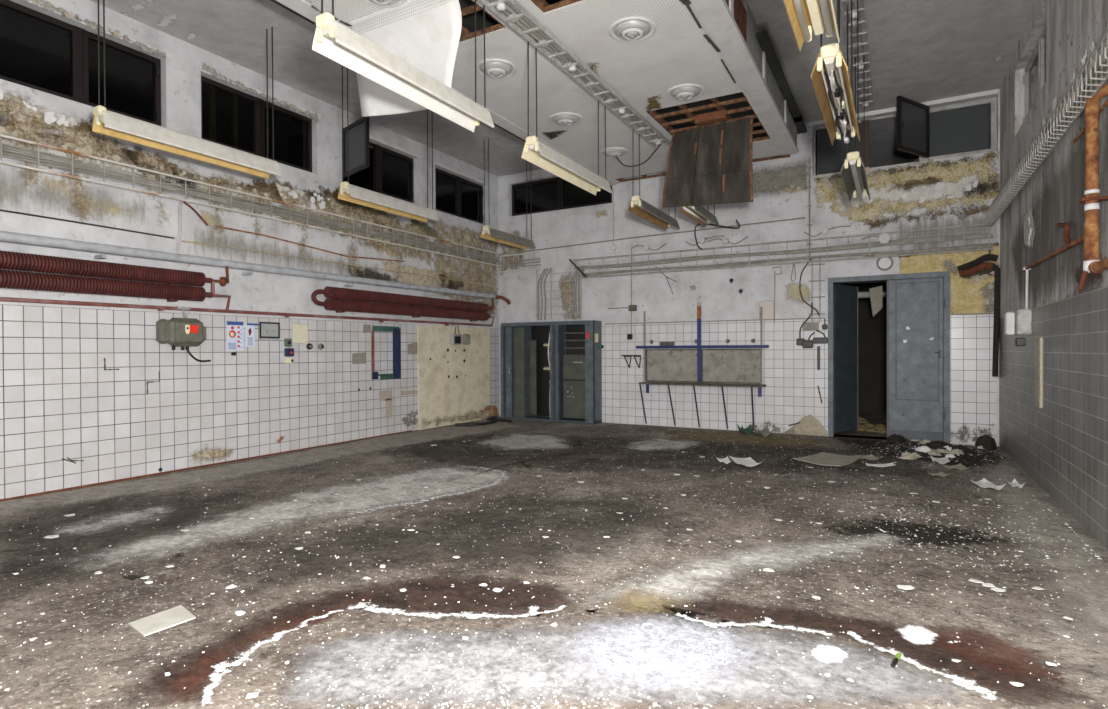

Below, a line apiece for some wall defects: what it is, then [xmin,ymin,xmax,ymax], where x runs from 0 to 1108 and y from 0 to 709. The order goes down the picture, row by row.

peeling [0,89,330,213]
peeling [783,152,1000,224]
peeling [944,261,998,313]
rust [1075,258,1102,293]